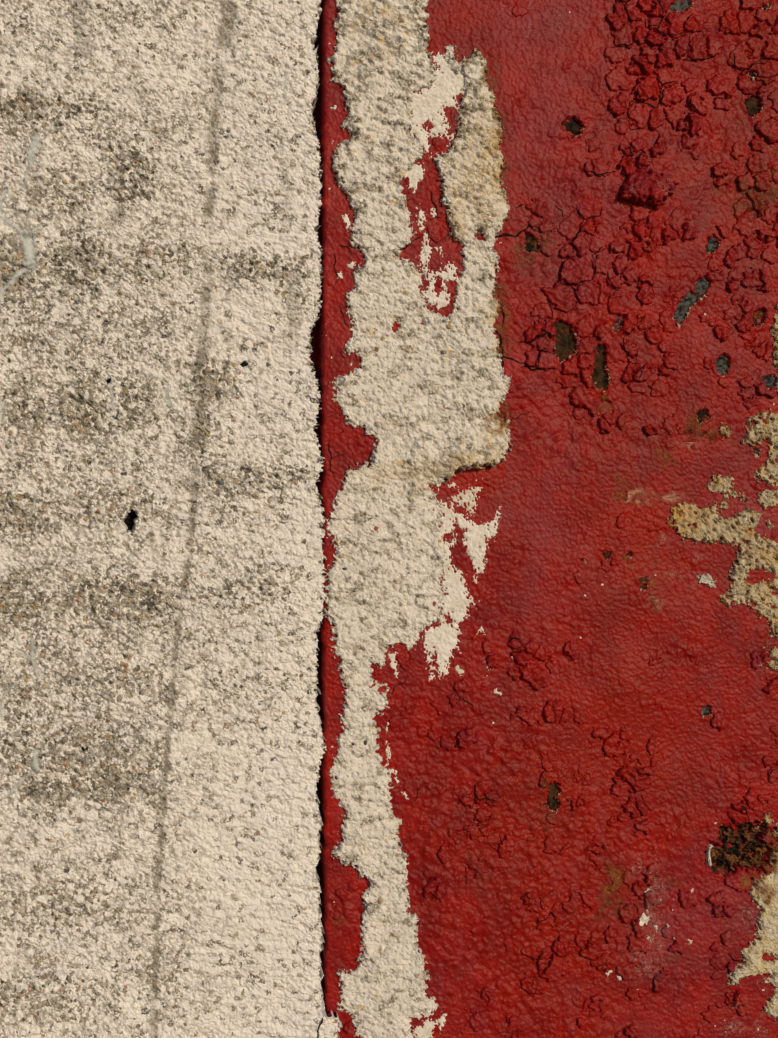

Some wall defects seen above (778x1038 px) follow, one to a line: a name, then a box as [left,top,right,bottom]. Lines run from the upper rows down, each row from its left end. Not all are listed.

crack [587,0,778,176]
crack [495,204,654,380]
spalling [704,821,776,877]
corrosion [741,832,776,903]